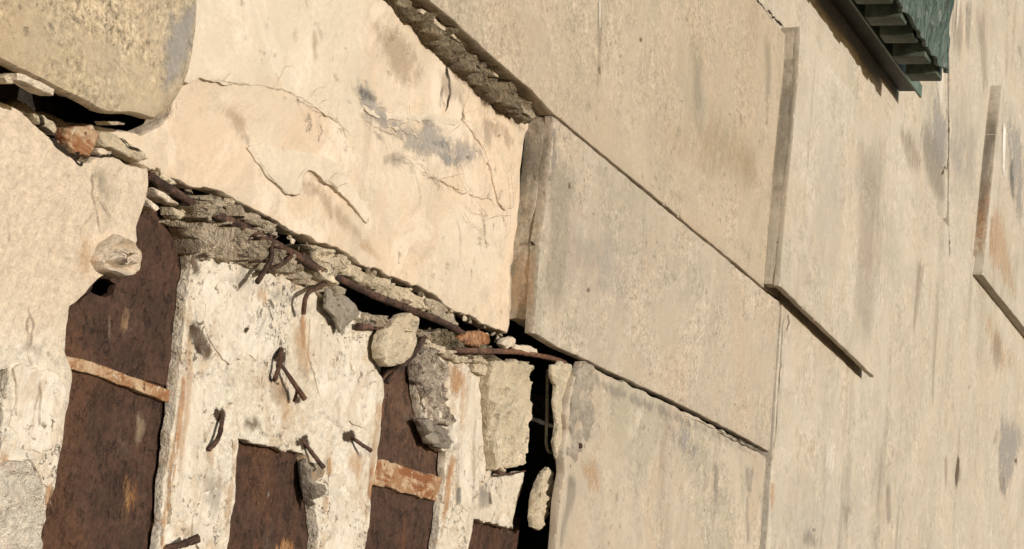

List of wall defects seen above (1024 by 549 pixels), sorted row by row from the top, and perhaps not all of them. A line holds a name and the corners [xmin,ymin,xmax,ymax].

peeling [184,0,540,210]
crack [218,57,516,274]
water stain [359,87,474,165]
spalling [0,73,503,511]
rust [148,171,567,364]
peeling [167,382,225,549]
peeling [325,472,360,549]